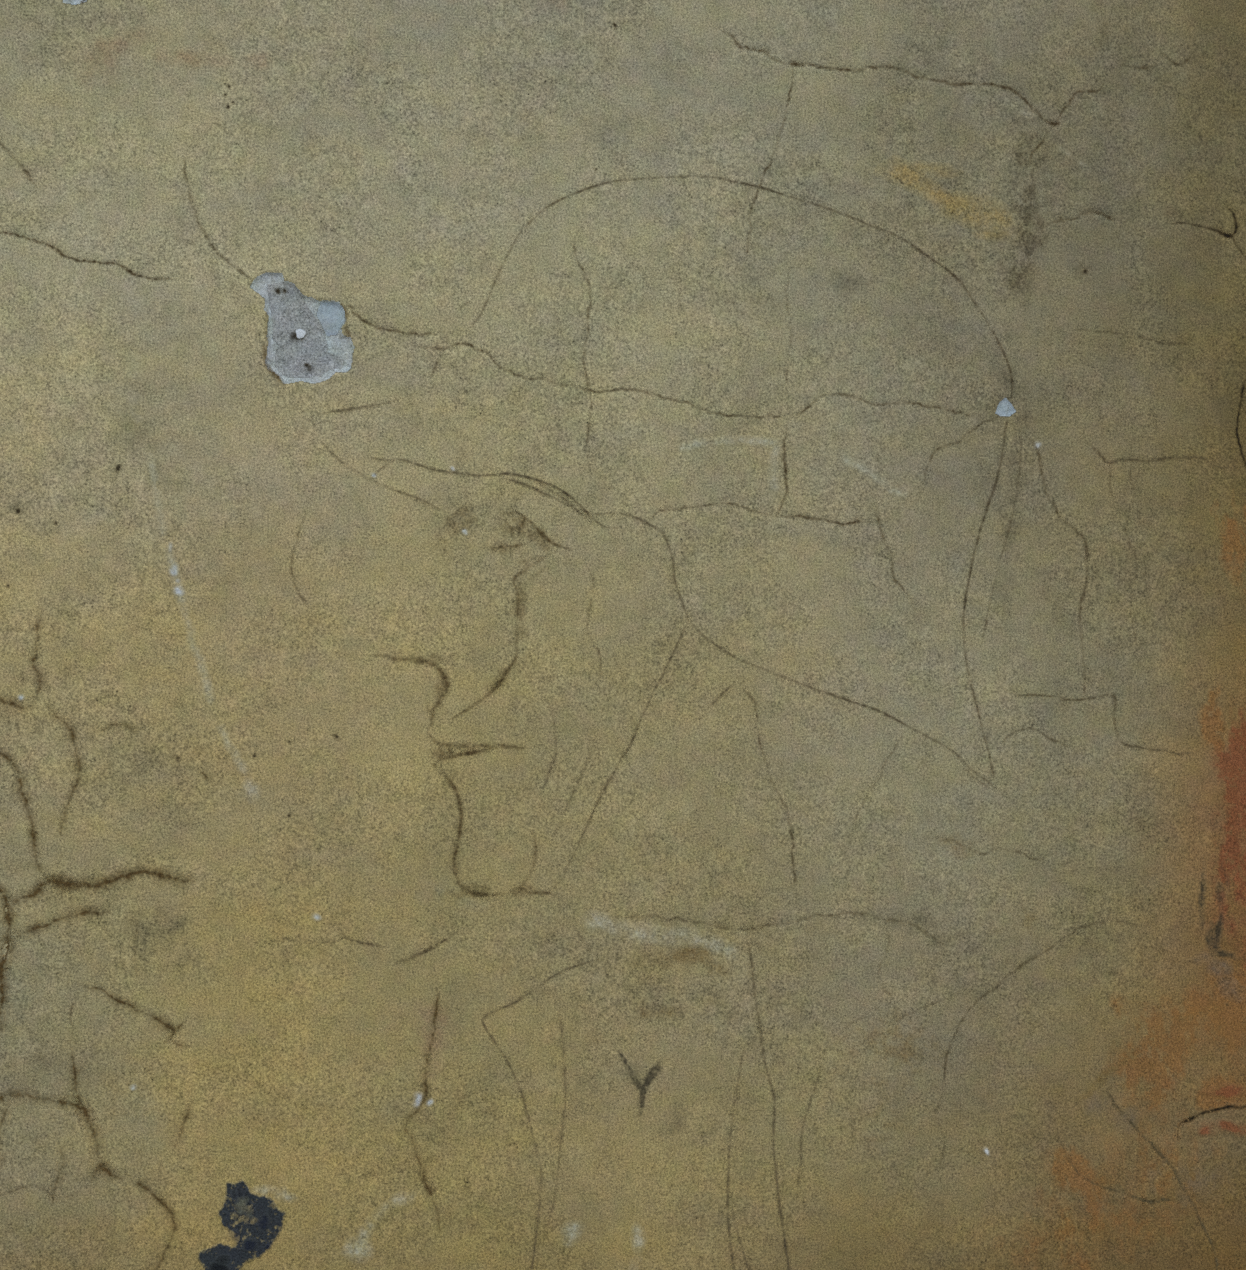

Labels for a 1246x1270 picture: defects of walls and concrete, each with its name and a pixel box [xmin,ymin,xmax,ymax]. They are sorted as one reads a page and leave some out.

crack [788,62,877,101]
crack [913,75,1094,152]
crack [5,232,160,280]
crack [1177,209,1243,254]
flaking render [250,272,355,384]
flaking render [995,398,1016,416]
crack [1236,385,1246,464]
crack [723,406,879,525]
crack [0,624,41,709]
crack [0,752,189,1014]
crack [72,987,182,1045]
crack [0,1057,176,1267]